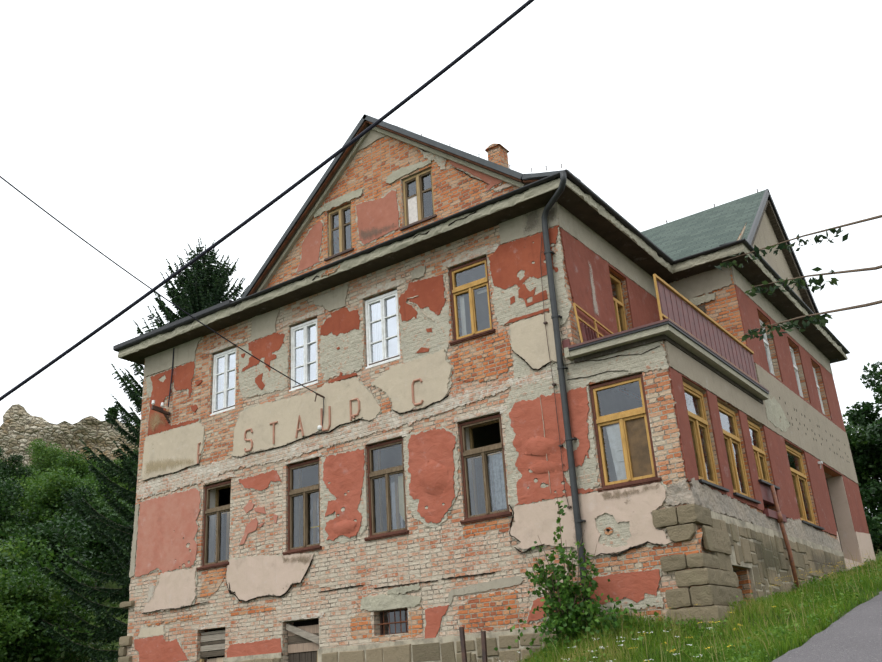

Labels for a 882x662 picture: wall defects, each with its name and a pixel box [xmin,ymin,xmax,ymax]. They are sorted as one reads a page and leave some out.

spalling [266,136,519,289]
spalling [128,225,842,662]